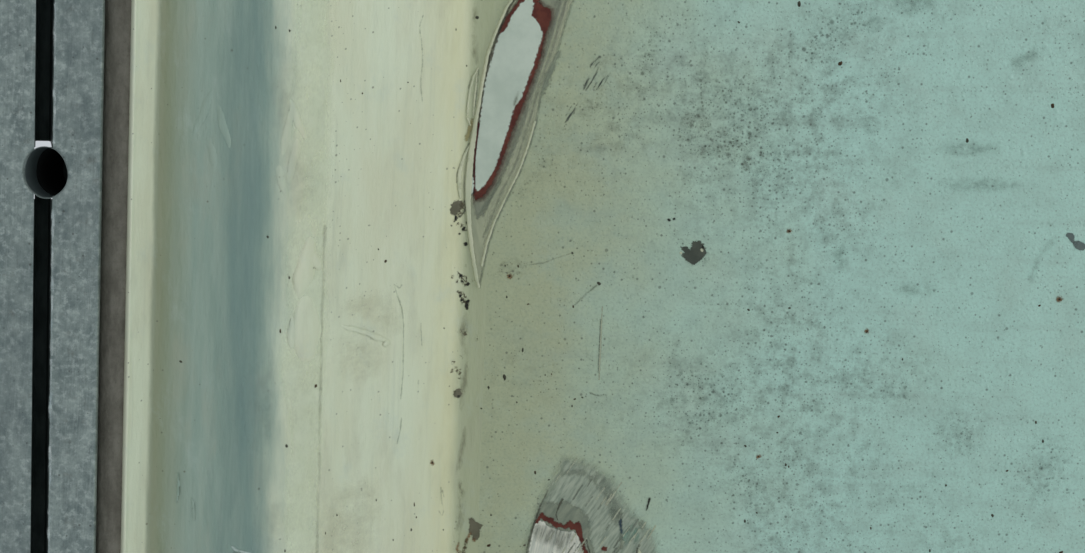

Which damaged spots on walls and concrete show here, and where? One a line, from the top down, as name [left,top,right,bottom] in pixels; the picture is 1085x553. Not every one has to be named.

peeling [450,0,572,288]
peeling [526,458,656,553]